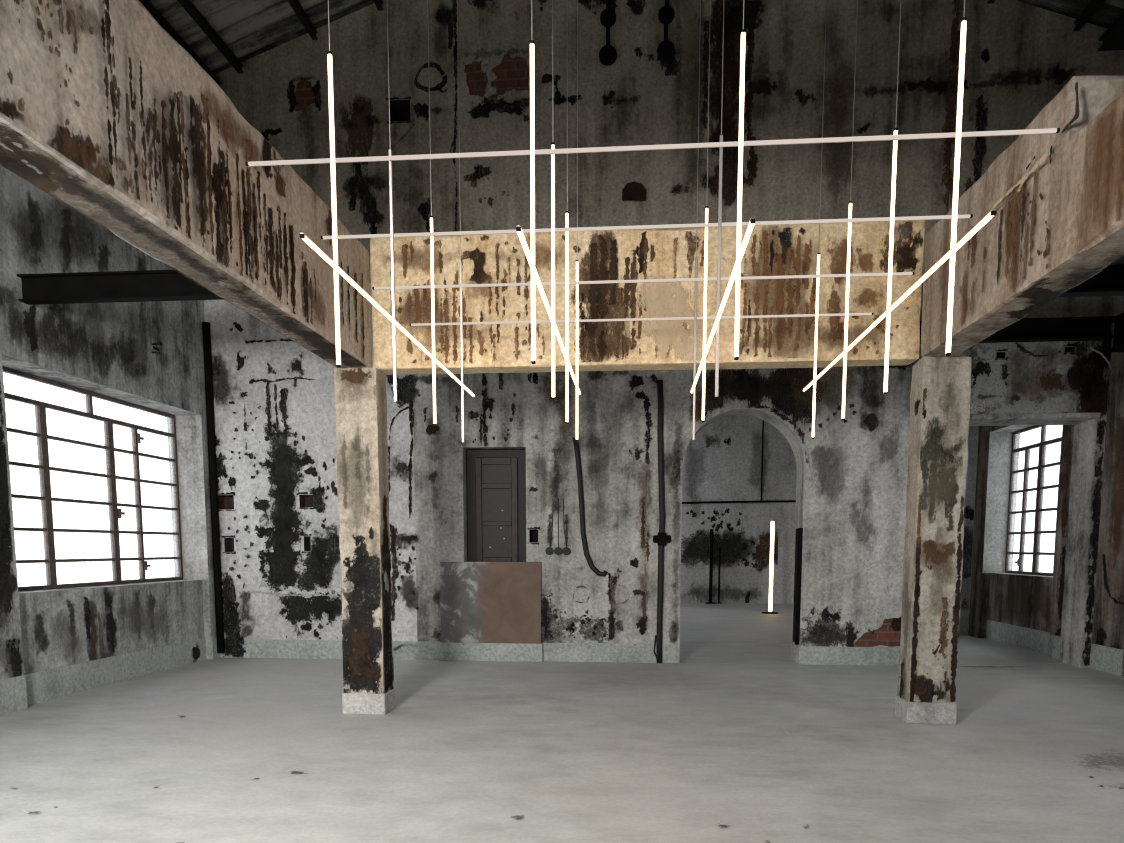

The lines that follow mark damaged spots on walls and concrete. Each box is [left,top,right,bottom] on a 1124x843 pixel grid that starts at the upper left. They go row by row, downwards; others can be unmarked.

corrosion [201,93,286,198]
spalling [386,62,448,124]
flaking render [463,49,561,101]
damp [743,26,758,187]
corrosion [390,235,557,363]
corrosion [673,231,705,279]
corrosion [739,222,913,358]
corrosion [997,181,1027,291]
damp [989,279,1052,319]
damp [265,379,296,439]
damp [921,460,974,577]
flaking render [846,496,922,702]